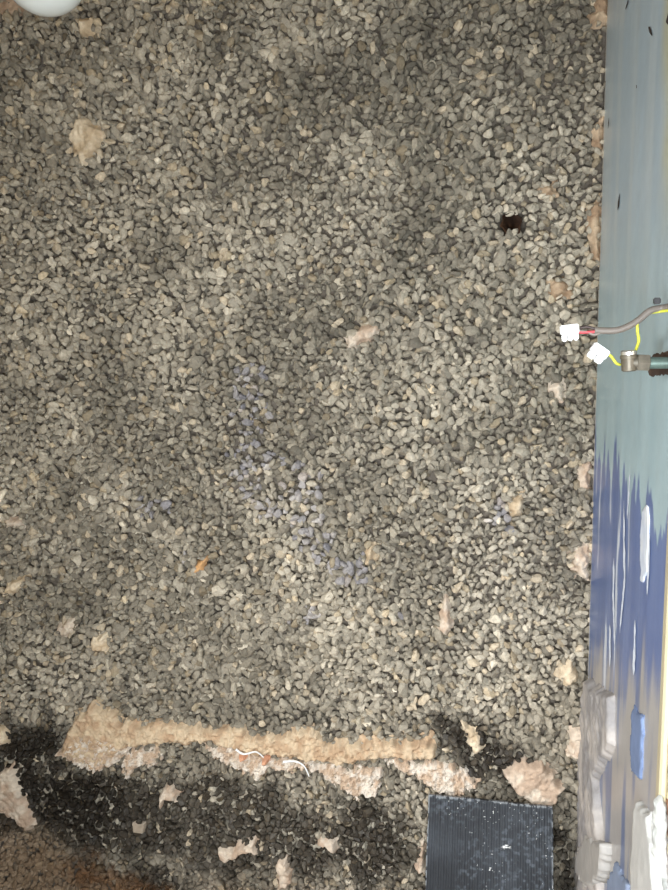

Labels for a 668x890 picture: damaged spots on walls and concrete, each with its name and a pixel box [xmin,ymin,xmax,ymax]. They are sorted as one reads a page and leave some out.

peeling [609,475,630,667]
peeling [640,505,650,593]
peeling [55,737,164,779]
flaking render [132,819,147,834]
leakage [0,721,405,890]
peeling [204,742,481,801]
leakage [434,714,532,789]
leakage [553,827,575,890]
flaking render [572,789,668,890]
flaking render [630,705,645,780]